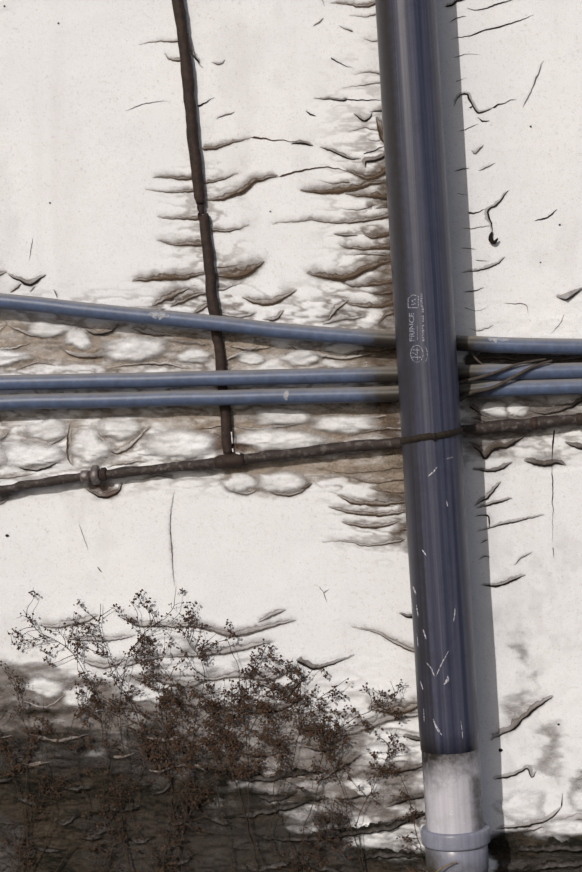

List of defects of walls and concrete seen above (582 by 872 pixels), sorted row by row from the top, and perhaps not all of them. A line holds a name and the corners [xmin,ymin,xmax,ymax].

crack [449,0,532,58]
peeling [202,96,394,325]
peeling [132,272,207,313]
peeling [0,424,74,479]
peeling [221,478,312,497]
peeling [322,462,407,547]
peeling [470,435,526,508]
peeling [524,430,566,467]
peeling [39,609,354,714]
leakage [0,663,426,872]
peeling [244,793,425,842]
leakage [488,830,582,872]